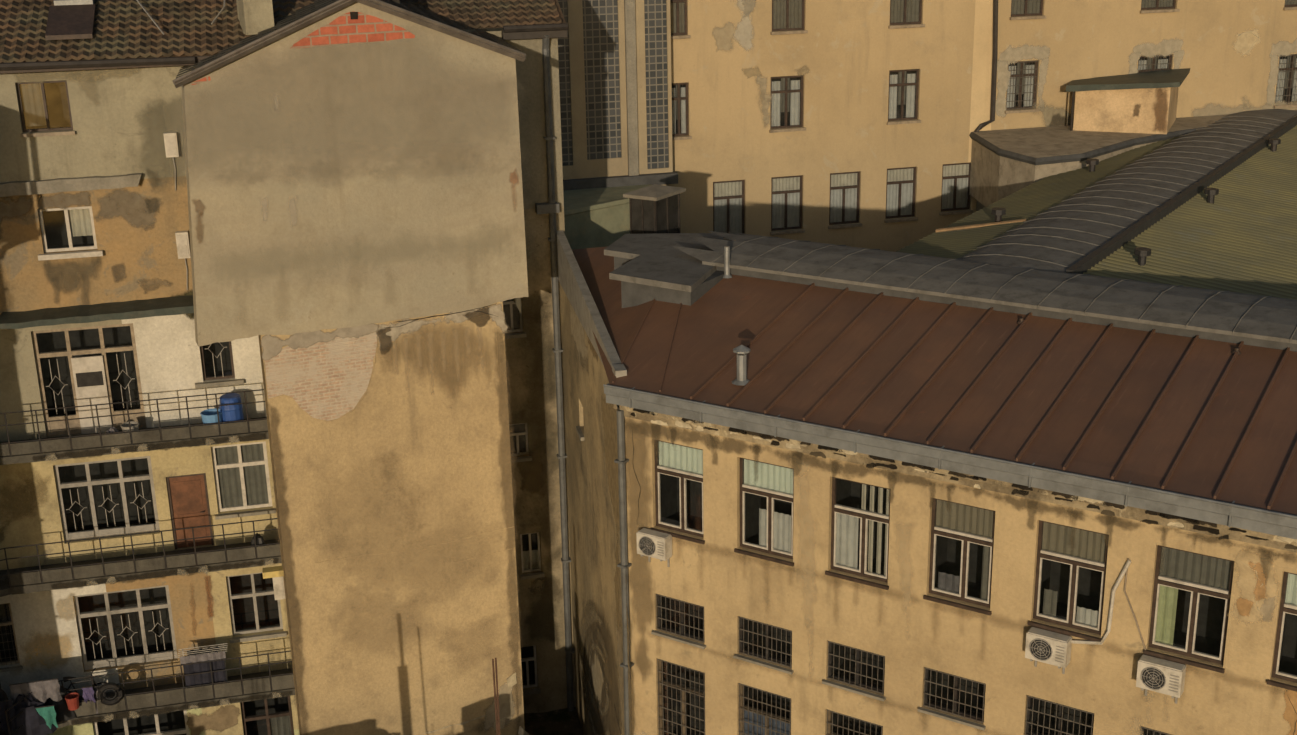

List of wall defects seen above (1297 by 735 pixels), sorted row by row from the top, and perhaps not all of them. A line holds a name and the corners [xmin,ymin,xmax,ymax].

peeling [713,0,756,51]
peeling [0,190,160,239]
peeling [112,264,172,294]
flaking render [261,304,508,422]
spalling [601,399,1297,735]
damp [588,644,621,735]